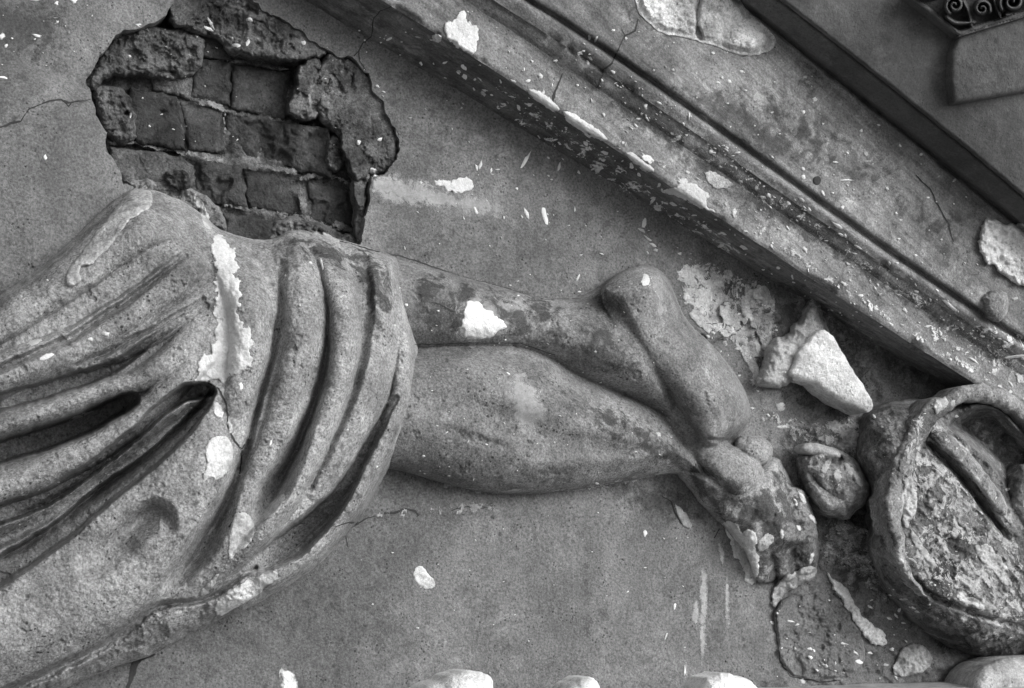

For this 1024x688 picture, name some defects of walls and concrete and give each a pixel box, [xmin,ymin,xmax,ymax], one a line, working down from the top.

flaking render [635,0,776,56]
crack [0,99,91,128]
peeling [478,78,654,193]
flaking render [65,0,397,386]
peeling [653,201,743,254]
crack [916,175,954,242]
peeling [462,300,507,339]
peeling [677,260,777,392]
peeling [749,221,1024,396]
crack [208,383,245,474]